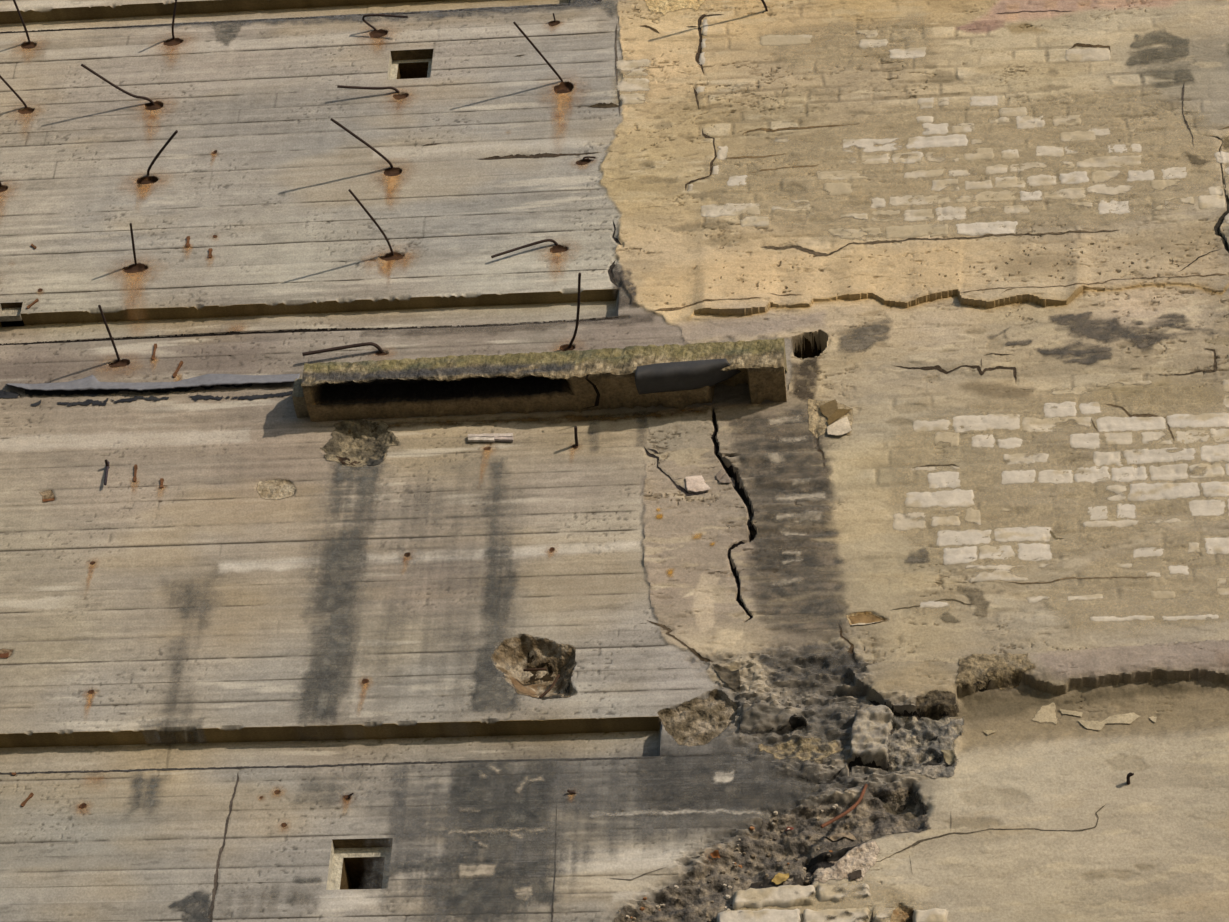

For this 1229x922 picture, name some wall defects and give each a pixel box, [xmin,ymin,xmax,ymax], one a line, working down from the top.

rust [554,82,573,125]
crack [685,14,860,188]
crack [965,85,1229,292]
rust [122,263,148,292]
rust [380,252,404,272]
leakage [370,409,708,449]
crack [644,409,757,622]
leakage [734,357,865,692]
spalling [490,634,577,700]
spalling [887,653,1036,779]
leakage [375,709,851,922]
flaking render [716,841,949,922]